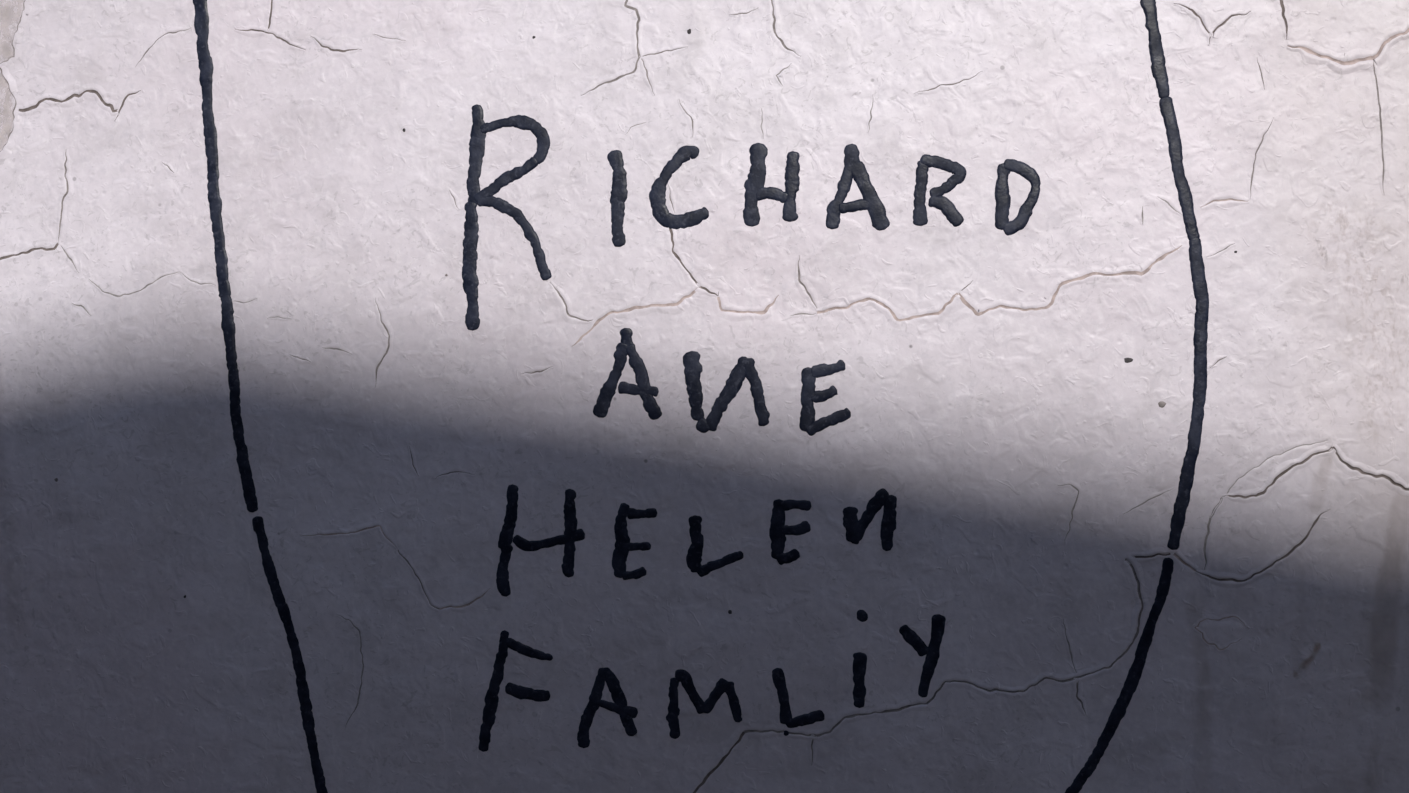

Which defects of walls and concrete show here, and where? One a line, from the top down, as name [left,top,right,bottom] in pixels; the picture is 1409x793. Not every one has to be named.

peeling [0,0,34,162]
crack [18,26,193,122]
crack [0,149,394,387]
crack [521,0,1409,378]
crack [687,435,1409,793]